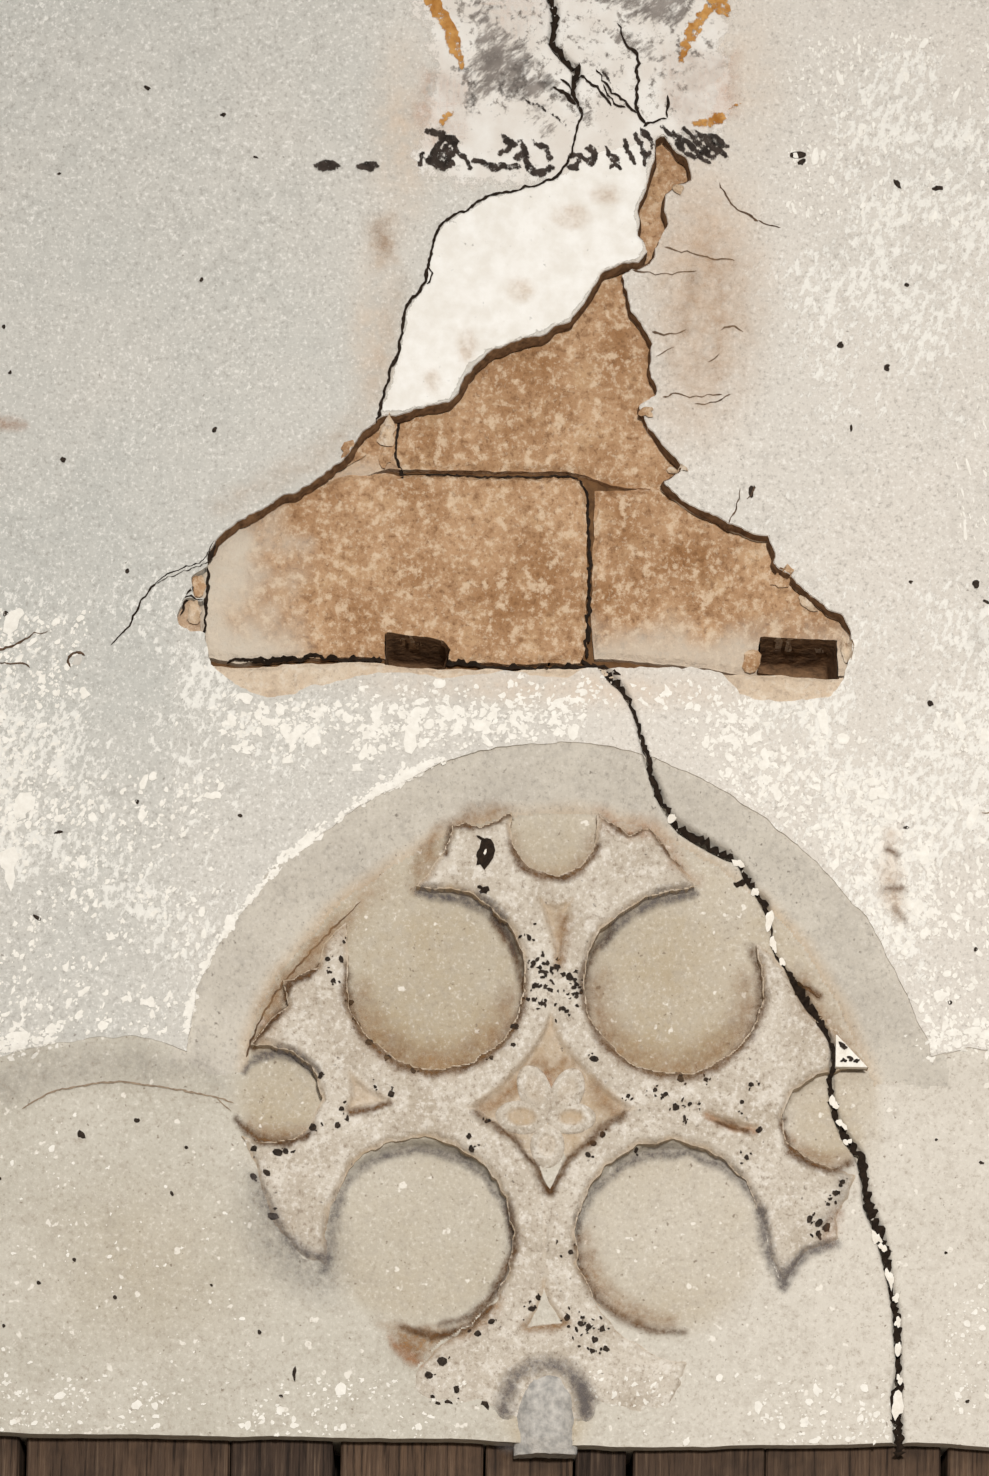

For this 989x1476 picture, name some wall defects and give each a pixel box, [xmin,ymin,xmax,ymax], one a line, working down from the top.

crack [111,541,216,645]
spalling [0,134,989,1063]
crack [376,0,670,428]
crack [581,659,906,1457]